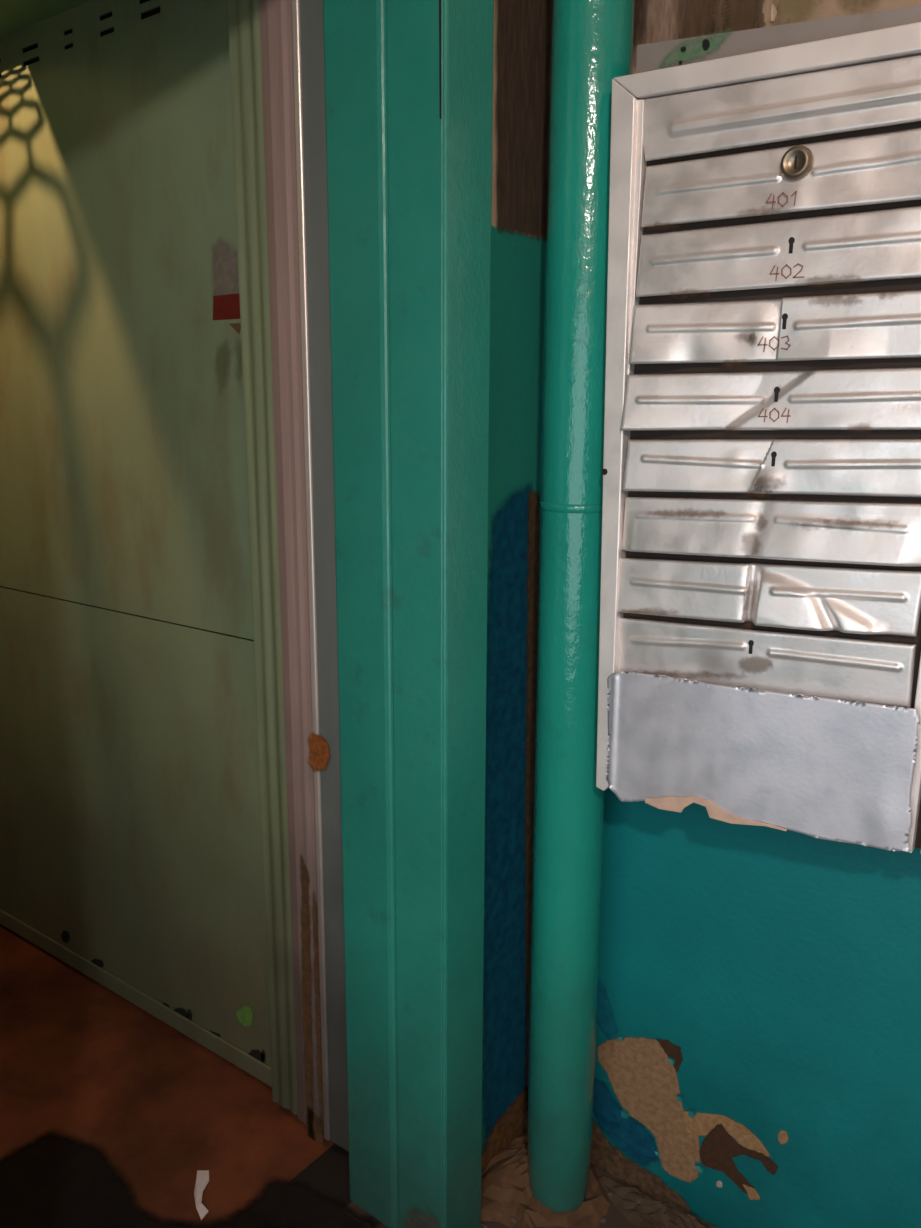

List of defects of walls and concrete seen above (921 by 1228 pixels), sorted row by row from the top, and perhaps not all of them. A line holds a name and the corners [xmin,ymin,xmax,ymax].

damp [633,0,766,63]
corrosion [308,733,330,772]
peeling [590,979,788,1212]